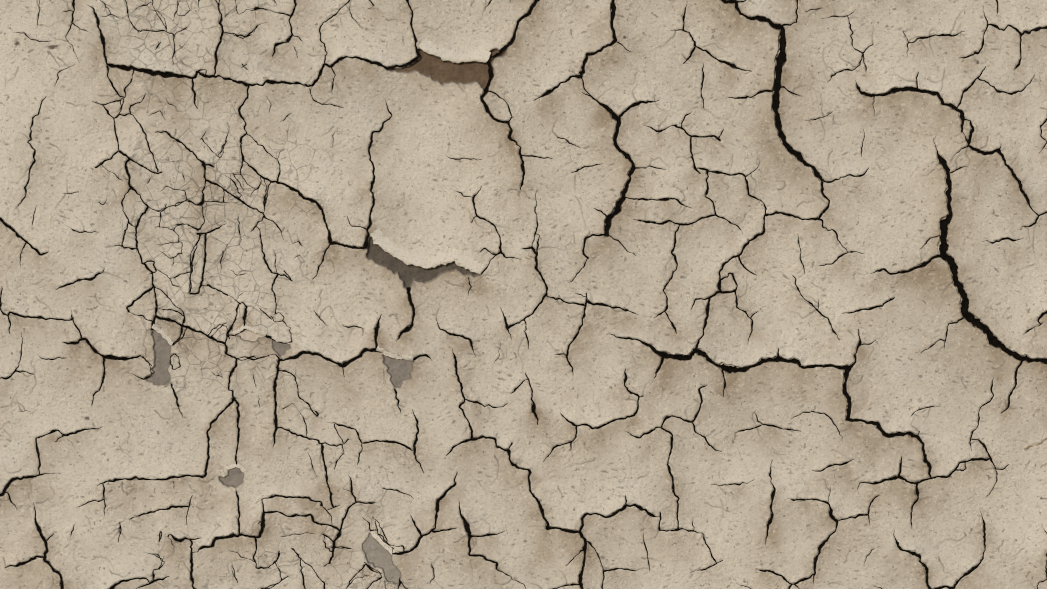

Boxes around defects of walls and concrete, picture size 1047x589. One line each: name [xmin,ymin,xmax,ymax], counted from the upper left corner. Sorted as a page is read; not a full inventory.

peeling [388,38,507,88]
peeling [367,228,484,287]
crack [0,0,526,589]
crack [437,0,1047,589]
peeling [363,531,400,583]